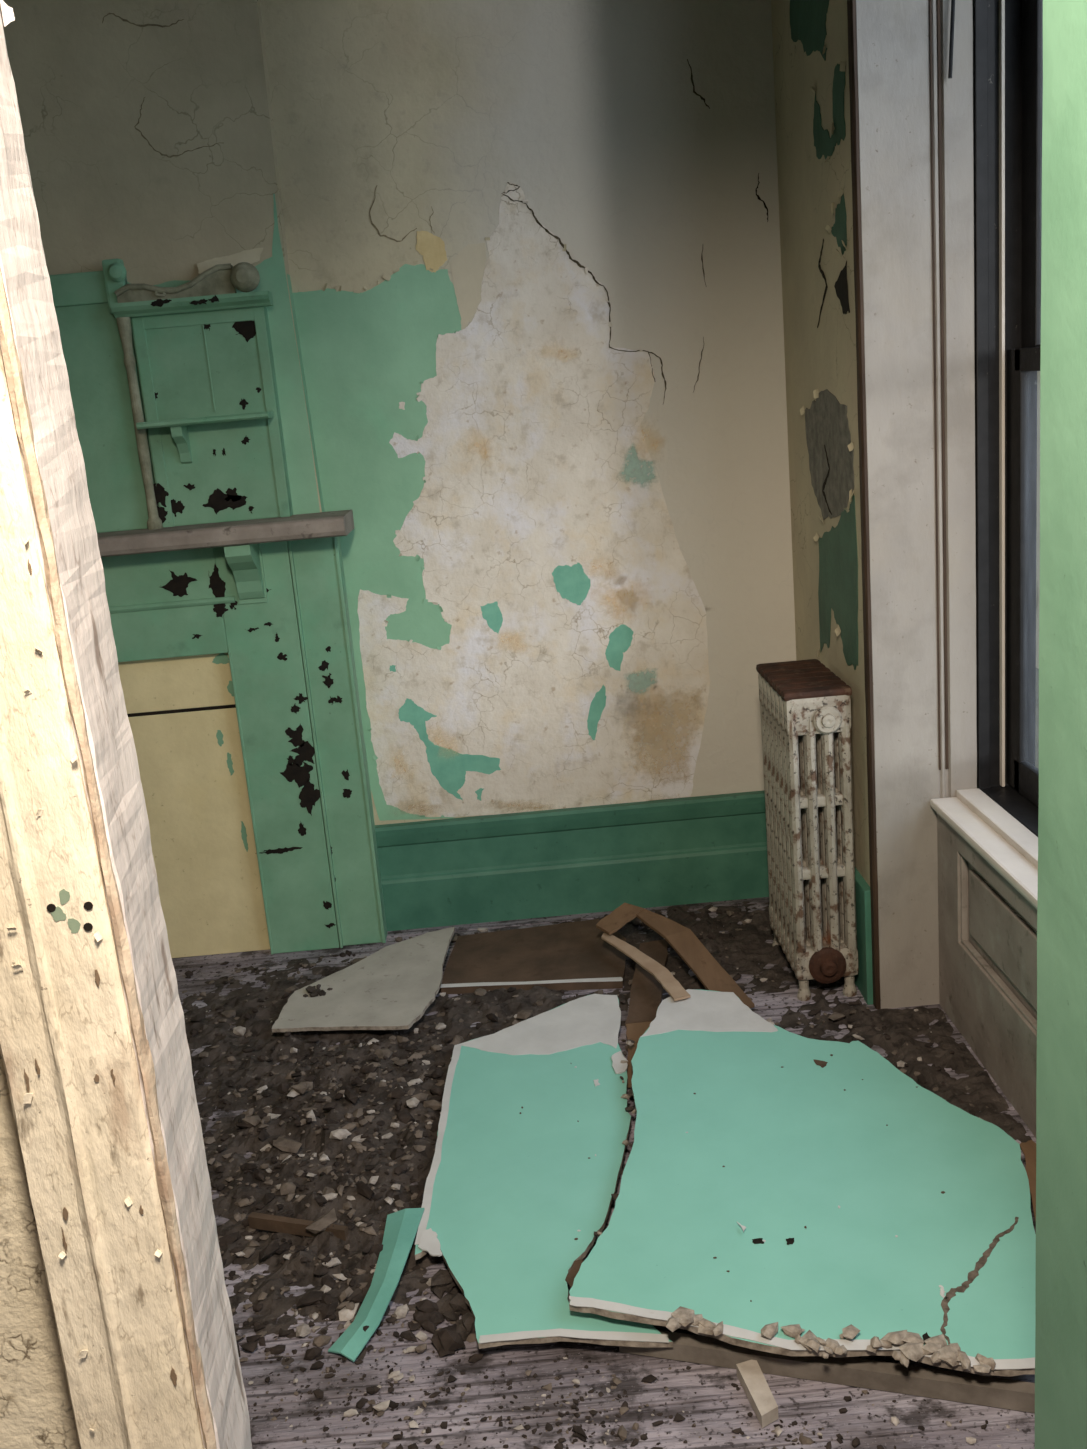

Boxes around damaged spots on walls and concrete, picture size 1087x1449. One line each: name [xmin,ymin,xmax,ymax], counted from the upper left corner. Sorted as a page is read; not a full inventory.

crack [102,13,184,28]
crack [134,97,218,158]
peeling [789,0,846,162]
peeling [825,188,850,314]
spalling [151,182,710,821]
peeling [800,389,858,670]
peeling [255,693,324,855]